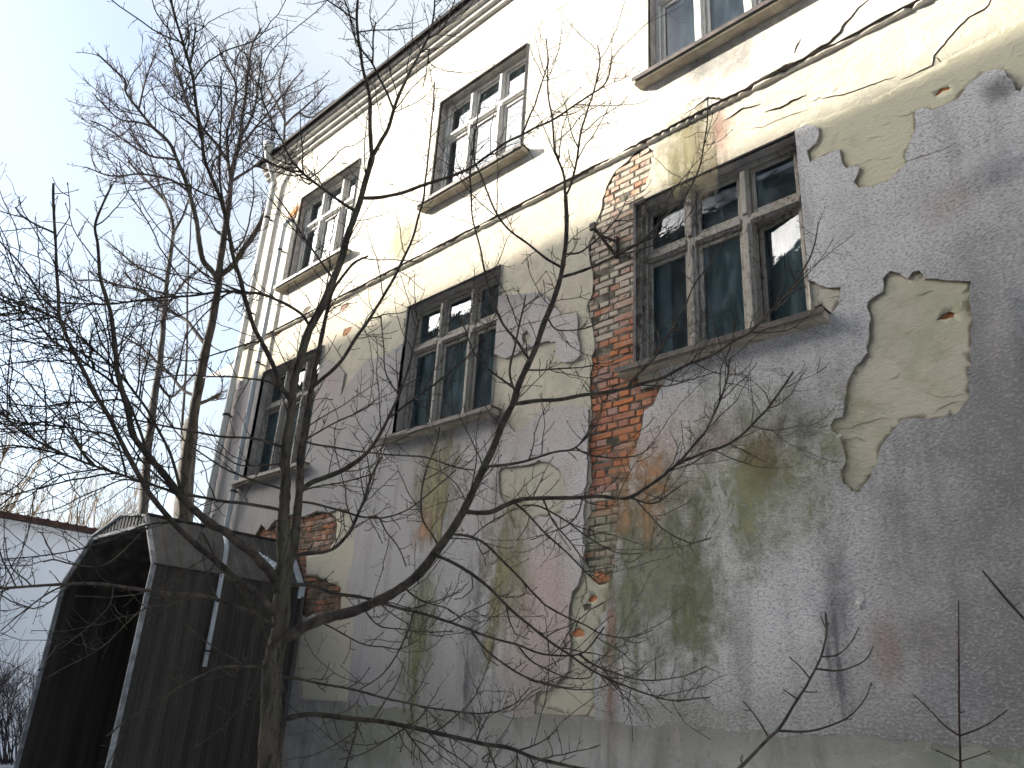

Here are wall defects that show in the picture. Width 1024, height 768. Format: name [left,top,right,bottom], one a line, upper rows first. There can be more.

crack [684,0,991,129]
peeling [800,17,1024,188]
flaking render [257,524,277,539]
peeling [289,508,356,702]
water stain [415,431,452,542]
water stain [484,512,524,660]
flaking render [537,147,662,717]
peeling [832,271,973,492]